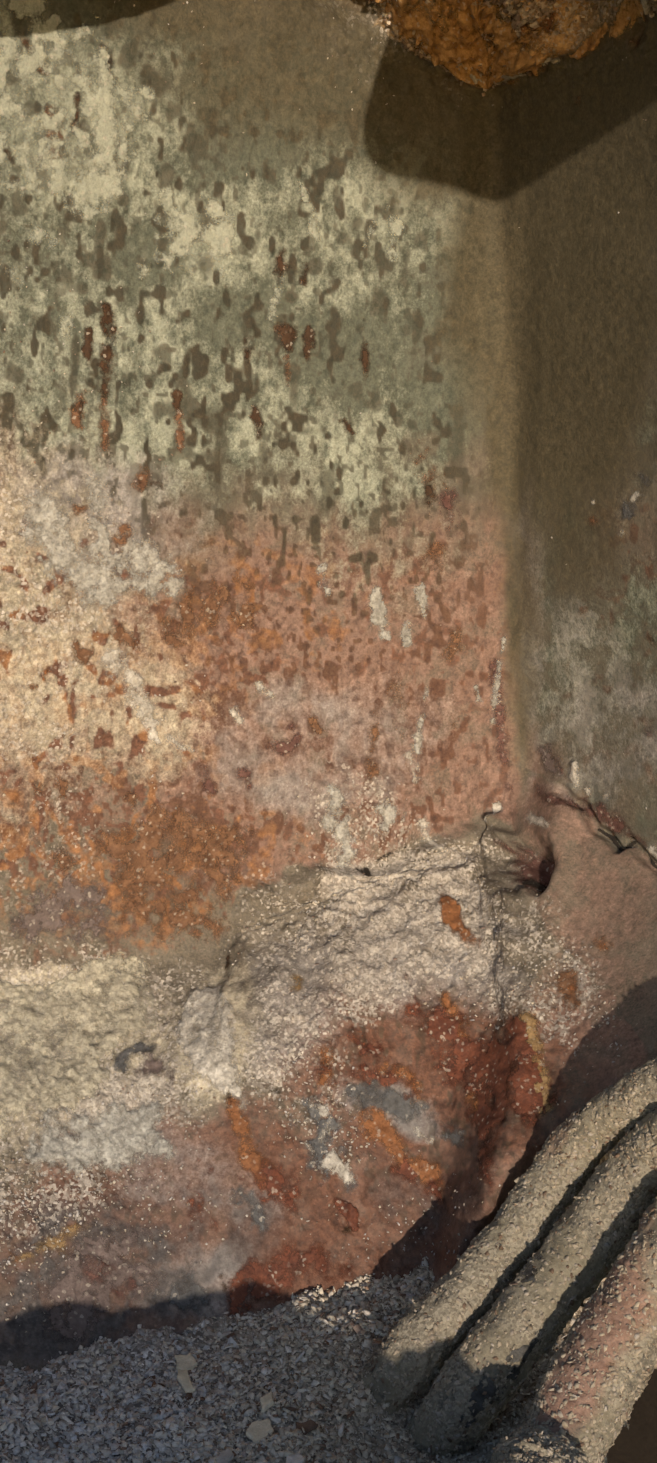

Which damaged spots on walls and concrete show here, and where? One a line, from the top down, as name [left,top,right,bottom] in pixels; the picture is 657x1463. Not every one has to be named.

rust [375,0,651,89]
rust [71,302,117,450]
rust [274,323,316,381]
rust [249,406,264,439]
rust [72,640,94,665]
leakage [528,744,657,857]
crack [560,768,657,869]
rust [10,792,254,943]
rust [438,895,482,945]
peeling [522,878,546,892]
rust [403,992,558,1187]
rust [221,1244,353,1317]